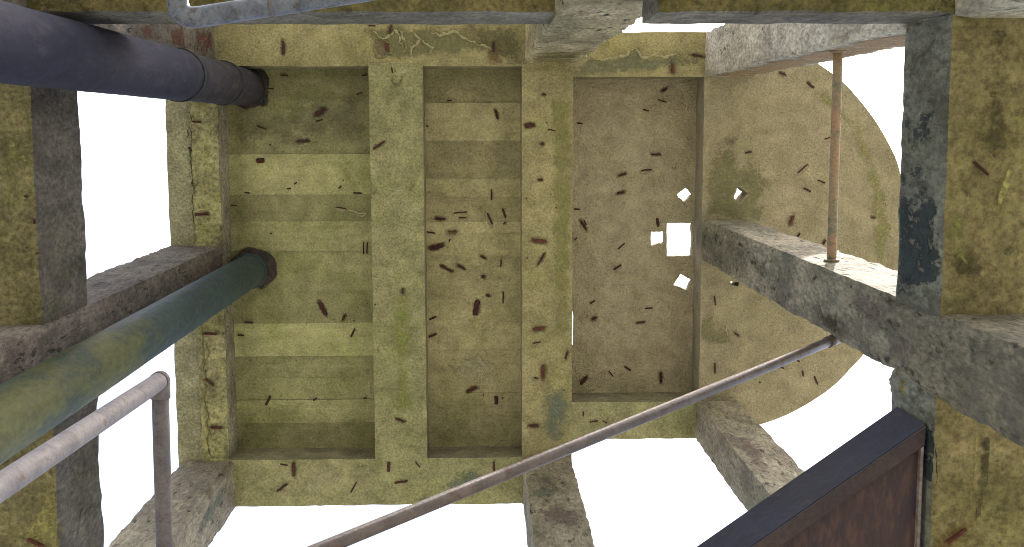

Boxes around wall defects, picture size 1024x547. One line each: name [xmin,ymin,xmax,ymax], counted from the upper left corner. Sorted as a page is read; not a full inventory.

crack [187,104,196,229]
rust [427,211,467,250]
rust [473,291,504,315]